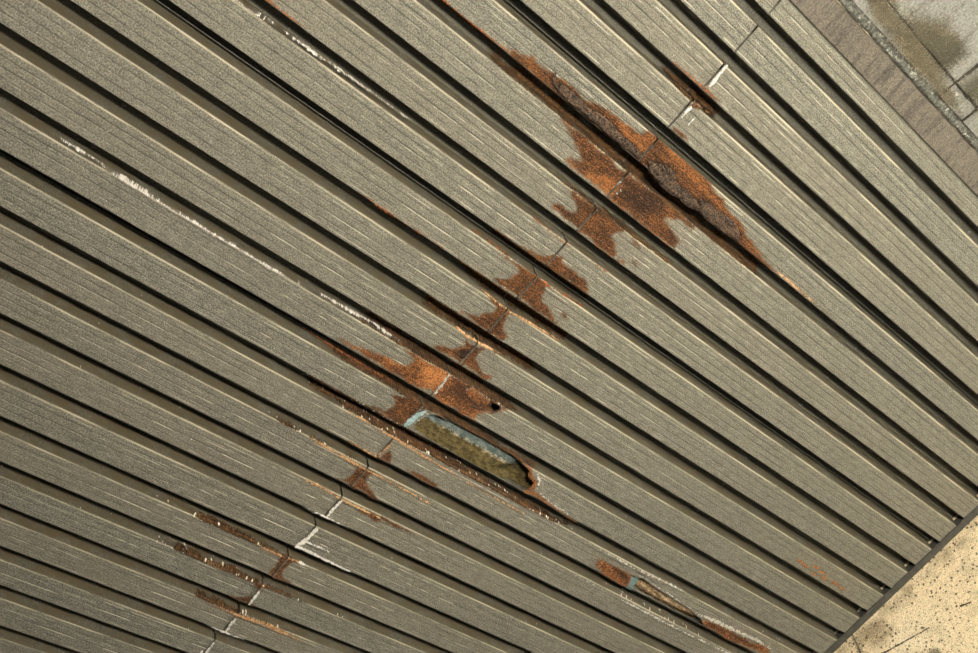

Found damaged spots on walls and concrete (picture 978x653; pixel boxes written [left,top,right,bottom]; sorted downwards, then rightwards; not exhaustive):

corrosion [442,0,823,310]
corrosion [269,228,590,534]
spalling [403,405,534,489]
corrosion [156,511,303,642]
corrosion [702,620,770,653]
crack [852,627,930,653]